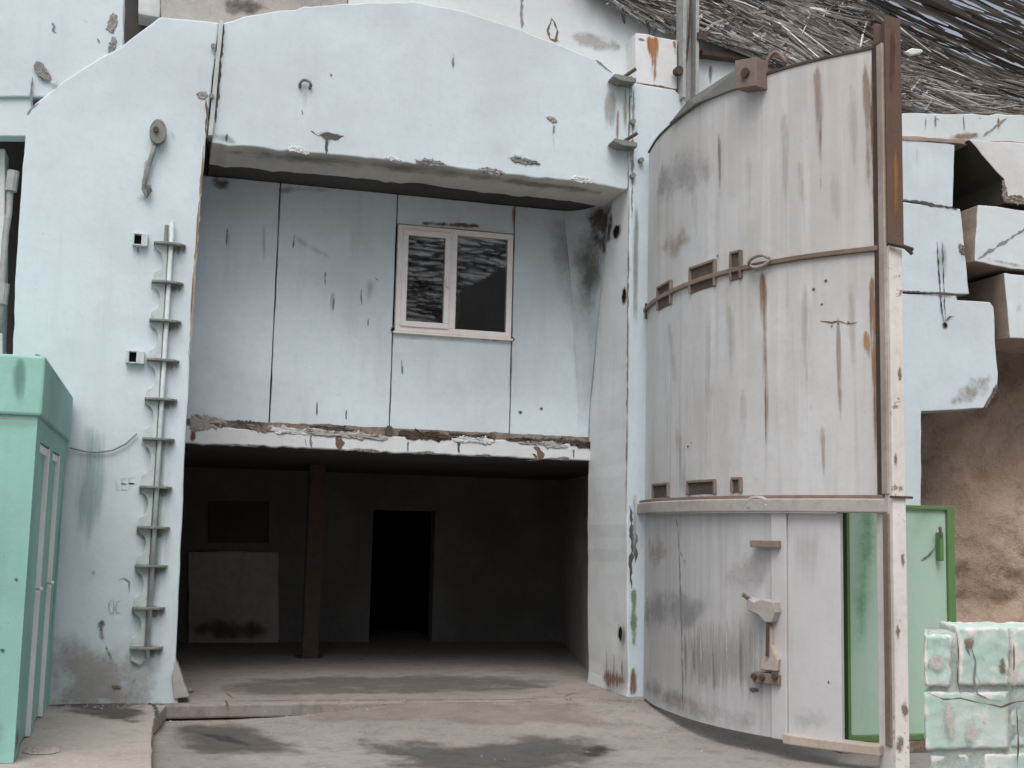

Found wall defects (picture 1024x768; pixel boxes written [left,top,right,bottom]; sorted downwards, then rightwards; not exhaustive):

spalling [105,13,118,53]
spalling [33,61,58,84]
rust [647,37,658,77]
spalling [416,157,447,167]
spalling [478,166,505,177]
spalling [510,154,540,166]
spalling [571,176,593,184]
crack [978,229,1024,259]
rust [864,278,876,440]
spalling [189,414,591,452]
peeling [628,508,638,589]
crack [928,638,1024,766]